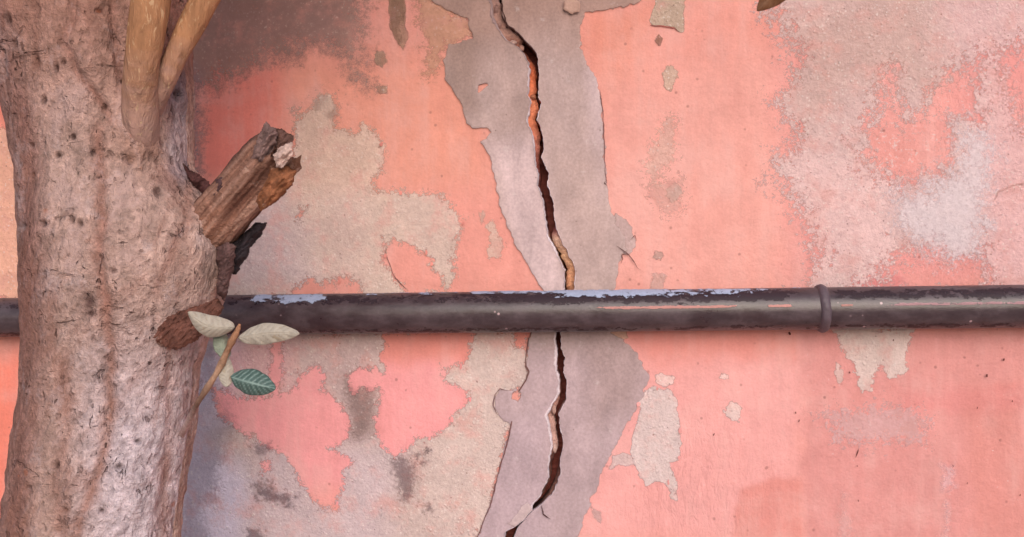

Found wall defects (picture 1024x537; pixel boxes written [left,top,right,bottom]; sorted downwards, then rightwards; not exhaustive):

peeling [649,0,685,46]
peeling [227,92,465,304]
peeling [479,212,507,260]
crack [488,0,576,290]
peeling [472,288,768,298]
water stain [889,131,996,261]
peeling [832,329,915,393]
peeling [181,332,528,537]
crack [477,332,567,537]
peeling [609,373,682,501]